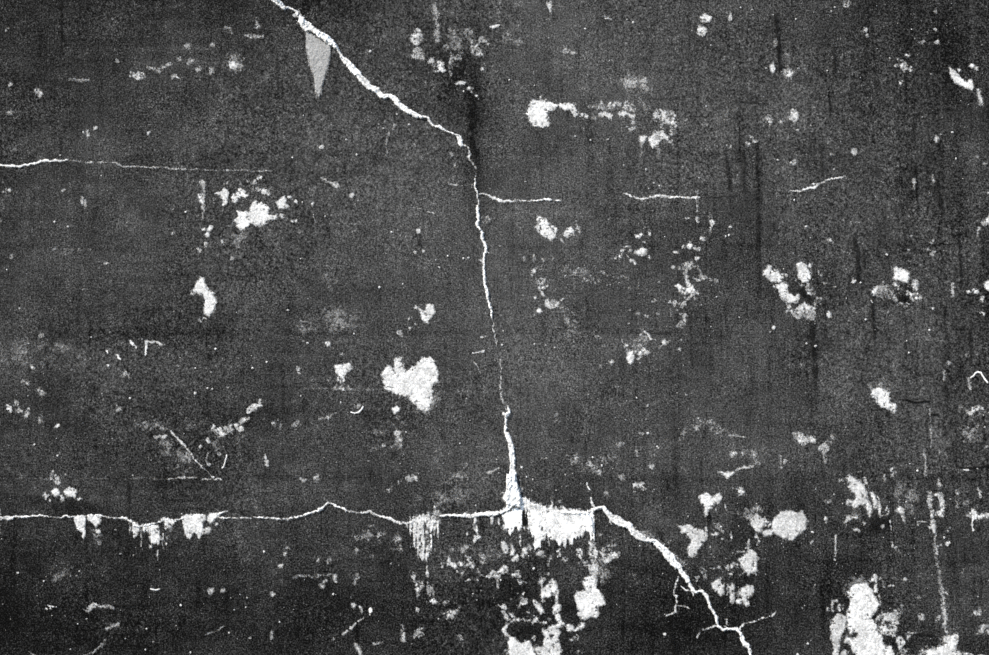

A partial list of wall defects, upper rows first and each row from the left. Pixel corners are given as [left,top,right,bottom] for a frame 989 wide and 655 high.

crack [0,159,92,168]
spalling [215,176,297,234]
crack [272,0,470,158]
crack [474,182,561,317]
spalling [526,96,677,148]
crack [627,194,709,220]
spalling [381,357,439,414]
crack [1,399,521,577]
spalling [486,542,618,655]
crack [586,484,775,655]
spalling [712,508,807,606]
spalling [827,574,913,655]